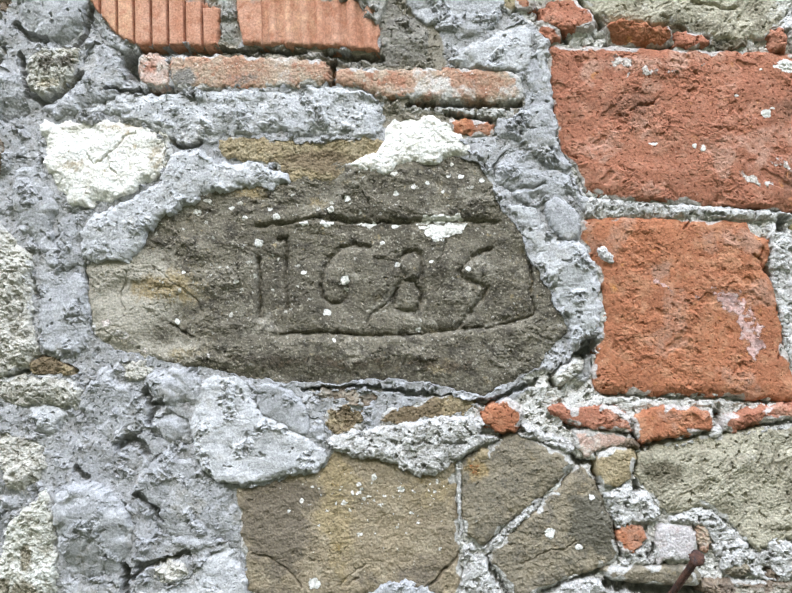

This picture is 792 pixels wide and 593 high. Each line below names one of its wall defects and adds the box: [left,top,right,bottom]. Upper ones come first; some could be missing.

crack [121,548,192,593]